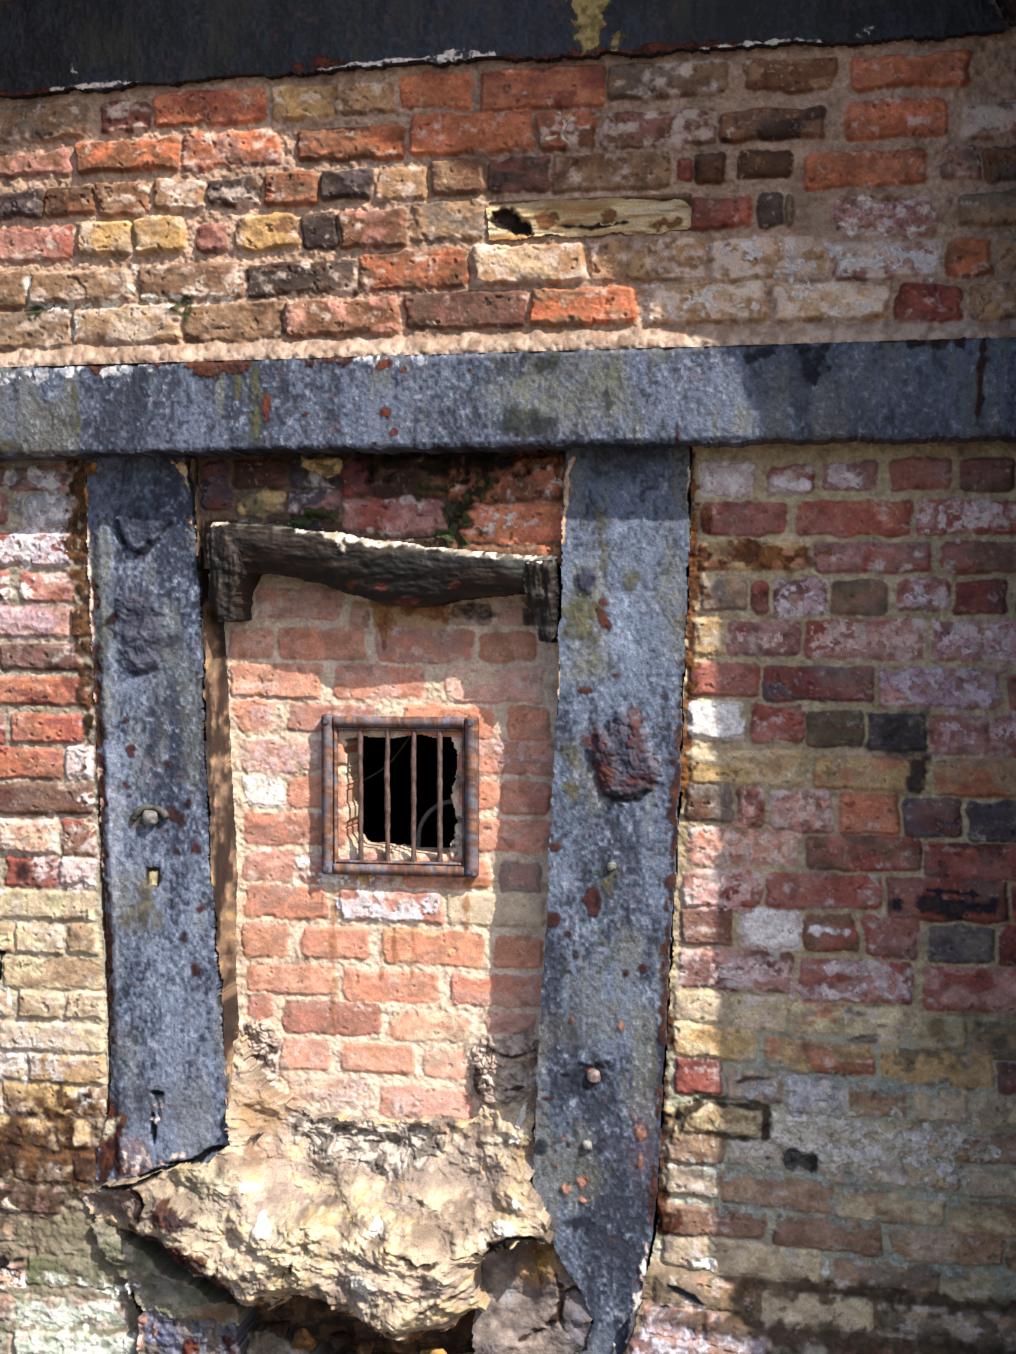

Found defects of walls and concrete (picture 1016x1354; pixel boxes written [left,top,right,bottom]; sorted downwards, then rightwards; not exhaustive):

water stain [0,985,106,1112]
spalling [238,1018,289,1091]
spalling [465,1028,540,1106]
crack [140,1145,224,1176]
water stain [0,1189,83,1213]
water stain [13,1273,140,1354]